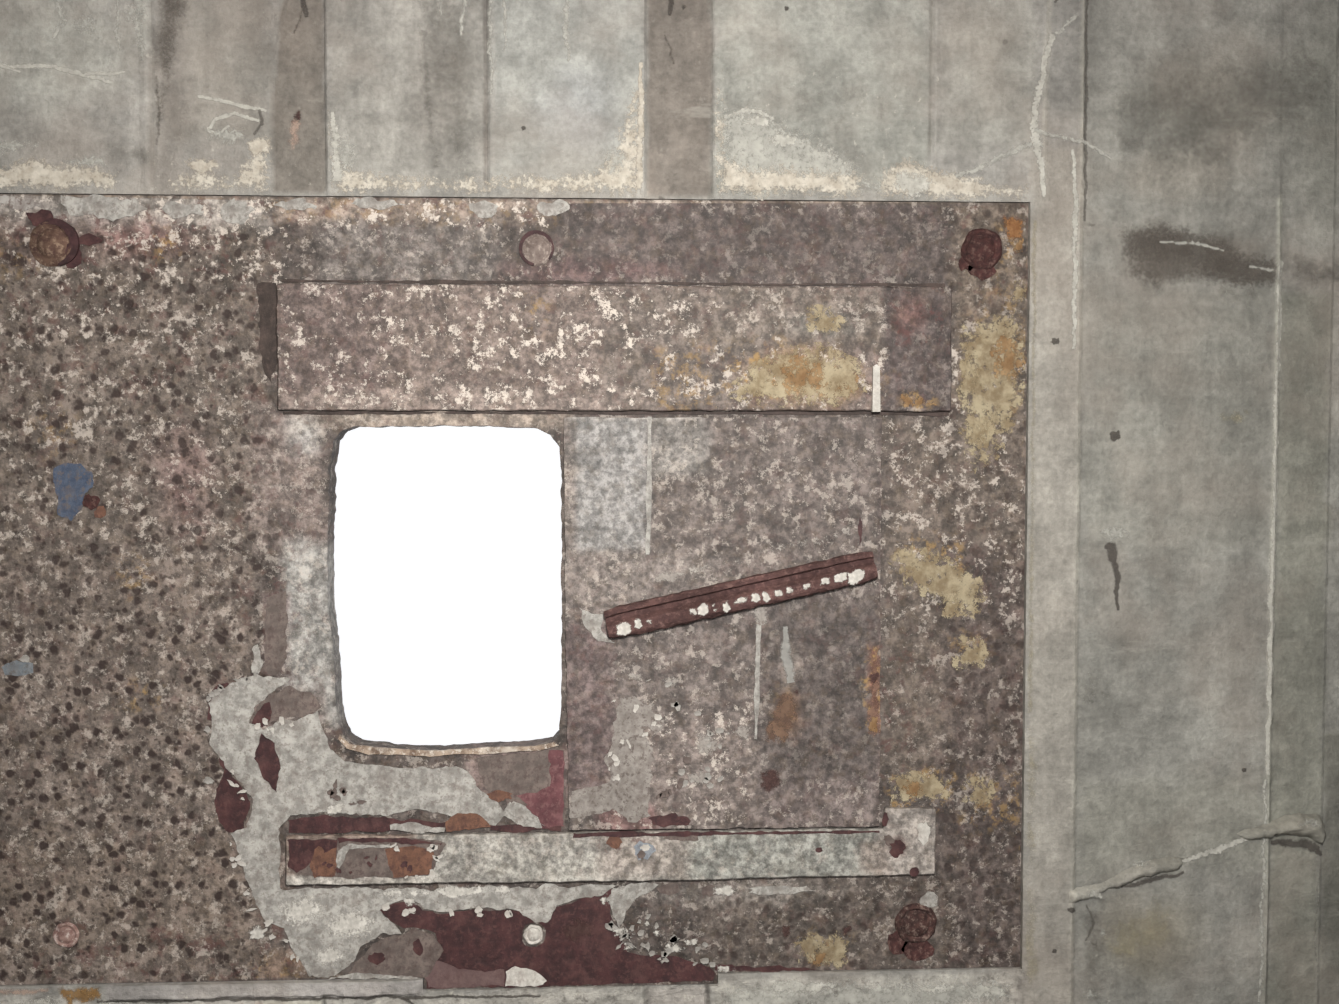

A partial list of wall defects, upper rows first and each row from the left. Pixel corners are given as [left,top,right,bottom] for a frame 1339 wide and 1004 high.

rust [26,209,54,227]
peeling [773,518,863,551]
peeling [655,565,708,582]
leakage [1129,227,1284,1002]
peeling [204,591,930,989]
peeling [919,891,938,907]
rust [887,930,935,961]